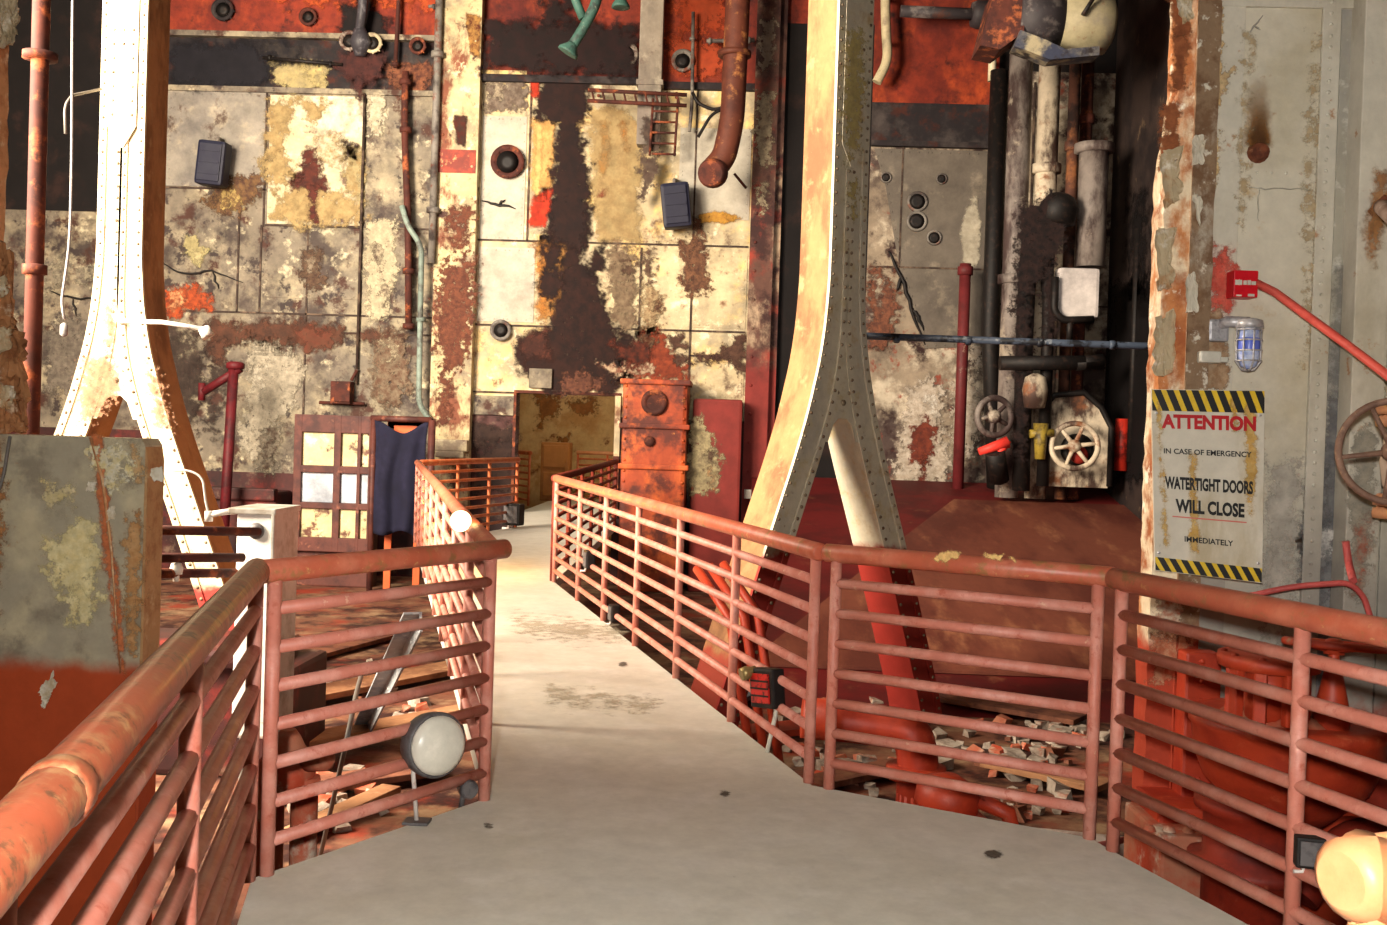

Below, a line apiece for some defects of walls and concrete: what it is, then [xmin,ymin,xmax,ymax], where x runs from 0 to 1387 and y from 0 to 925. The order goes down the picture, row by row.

rust [276,0,435,14]
rust [466,13,482,57]
rust [1157,0,1192,172]
peeling [195,59,402,322]
peeling [0,241,94,434]
rust [165,72,747,500]
rust [865,263,903,353]
peeling [39,439,164,628]
rust [71,295,175,674]
rust [907,414,939,481]